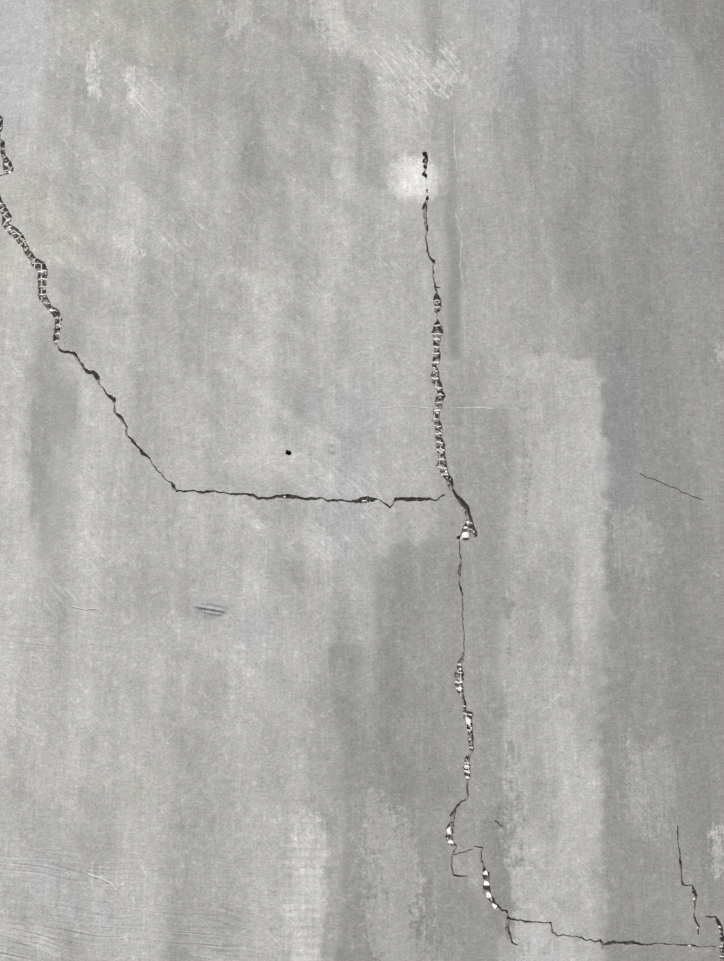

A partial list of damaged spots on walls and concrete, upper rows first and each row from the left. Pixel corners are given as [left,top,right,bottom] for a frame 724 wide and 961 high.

crack [0,115,14,176]
crack [421,151,429,178]
crack [0,195,445,508]
crack [422,189,724,961]